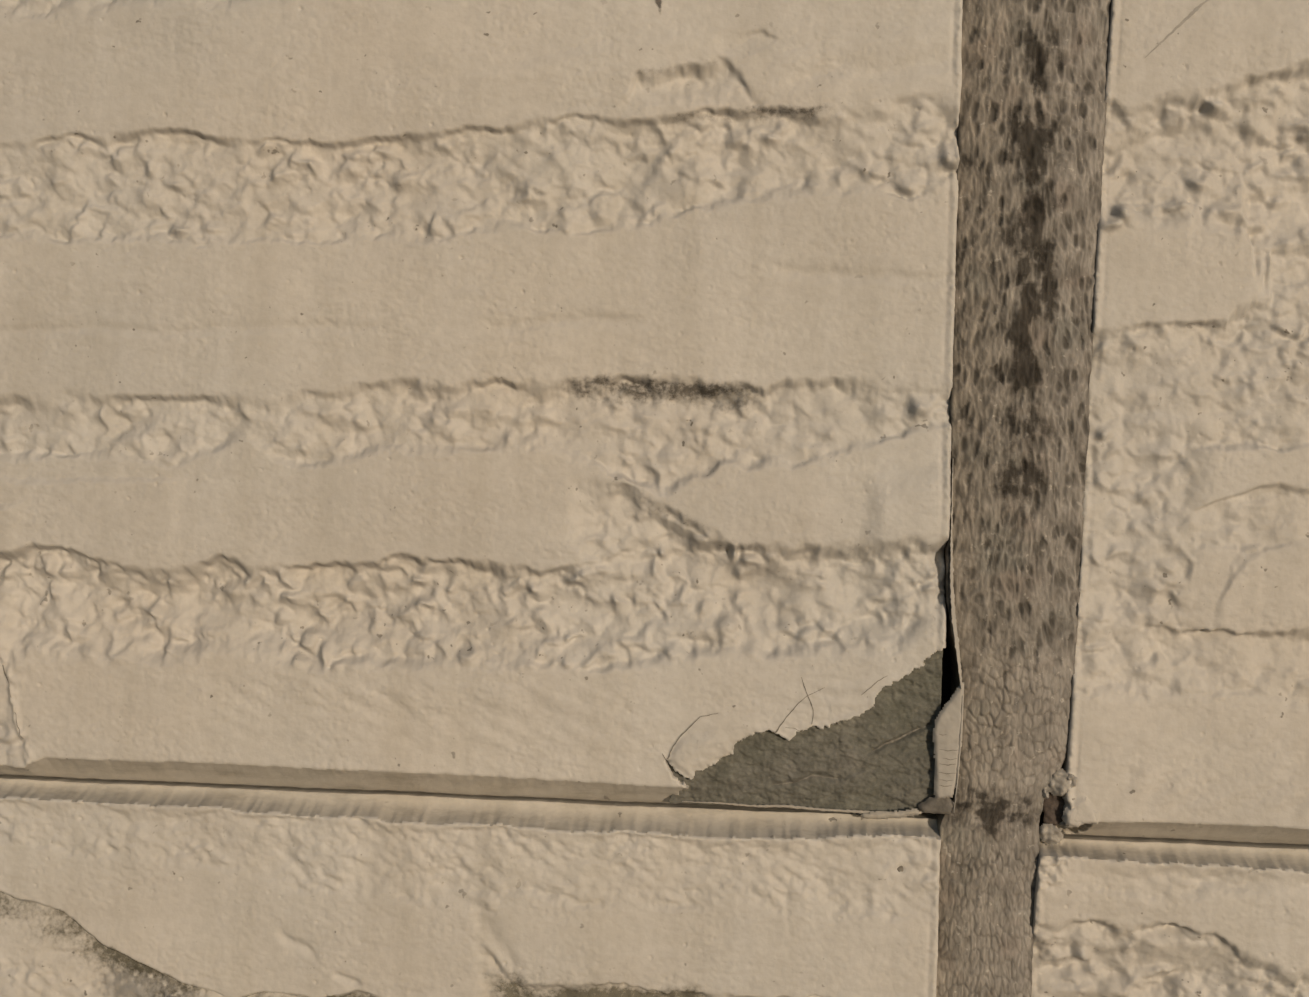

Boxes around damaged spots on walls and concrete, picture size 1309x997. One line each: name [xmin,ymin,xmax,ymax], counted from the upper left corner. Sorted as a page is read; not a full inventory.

spalling [666,650,964,822]